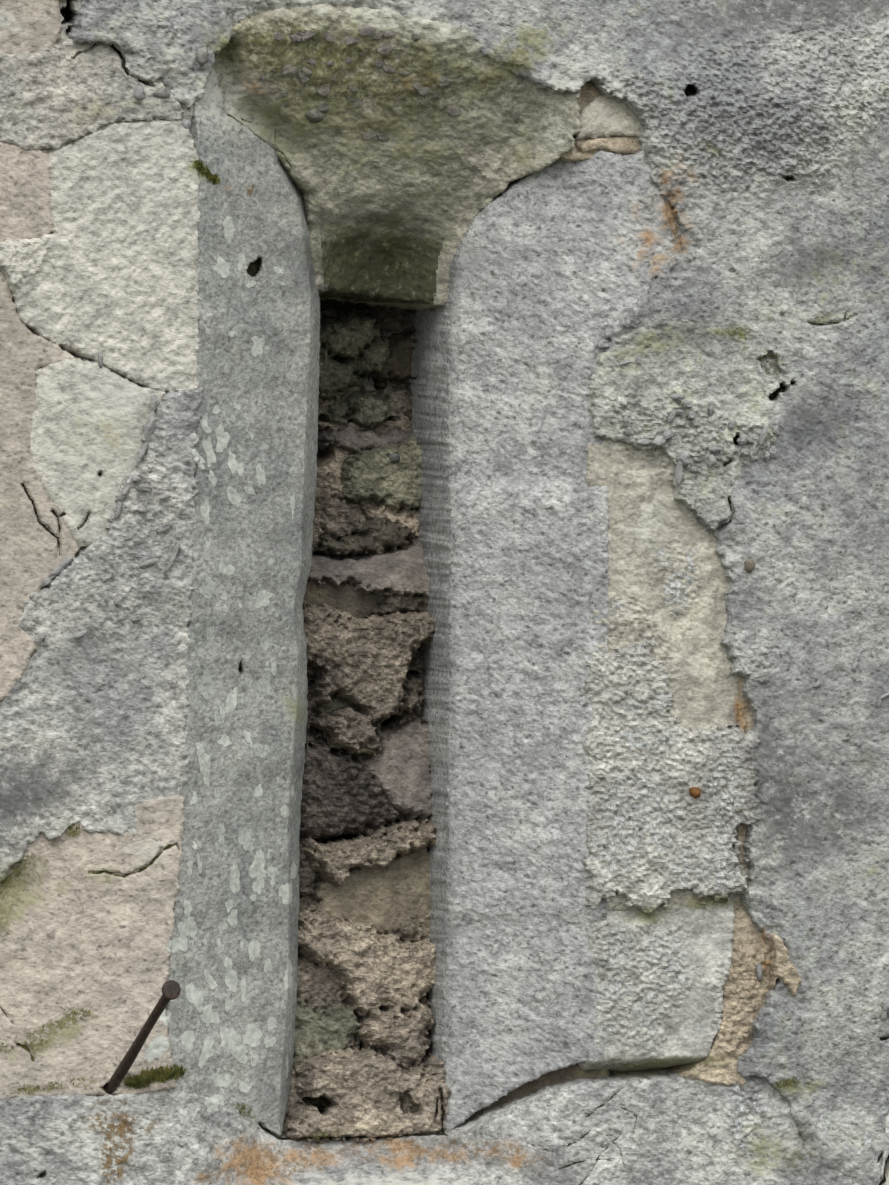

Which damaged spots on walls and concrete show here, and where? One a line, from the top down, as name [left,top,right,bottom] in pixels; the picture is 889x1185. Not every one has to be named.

flaking render [0,0,83,55]
crack [77,44,154,87]
water stain [260,25,451,113]
peeling [114,394,171,519]
peeling [42,556,74,586]
flaking render [578,393,802,1088]
crack [878,1153,889,1185]